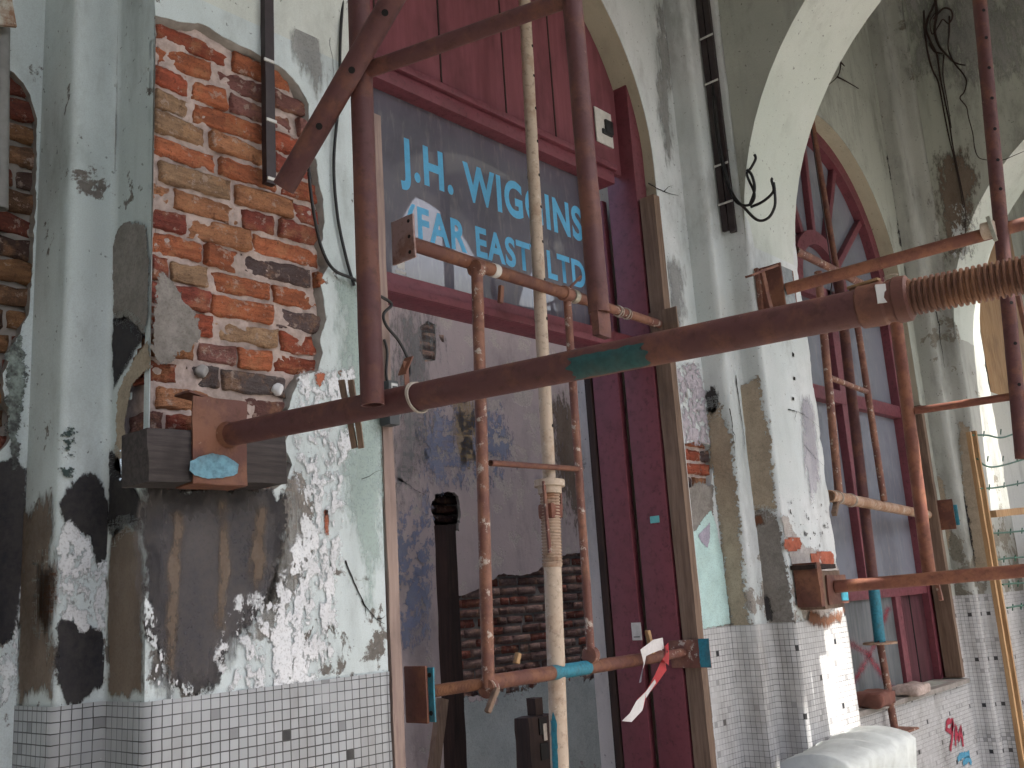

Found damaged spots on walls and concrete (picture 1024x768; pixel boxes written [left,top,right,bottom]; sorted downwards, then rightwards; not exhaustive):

flaking render [0,77,35,470]
flaking render [112,16,355,474]
damp [927,146,980,257]
peeling [57,520,107,633]
damp [0,451,292,705]
peeling [213,426,355,691]
flaking render [459,566,549,768]
flaking render [561,553,586,663]
peeling [566,674,602,768]
flaking render [676,360,839,629]